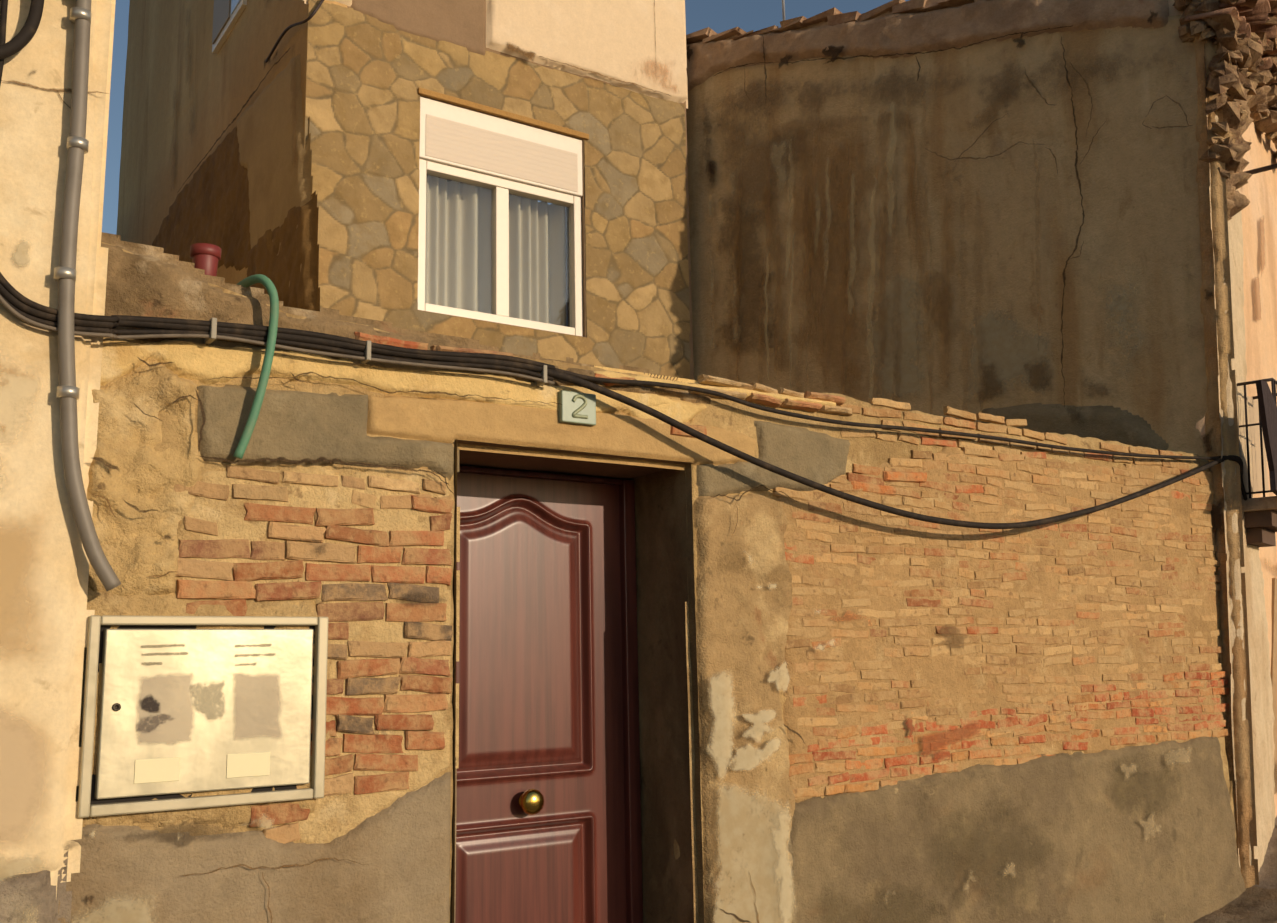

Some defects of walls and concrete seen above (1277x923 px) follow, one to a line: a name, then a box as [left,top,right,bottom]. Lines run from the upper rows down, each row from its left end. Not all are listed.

water stain [708,125,801,348]
crack [714,25,1106,406]
spalling [92,457,119,470]
spalling [173,390,206,452]
flaking render [147,466,454,797]
flaking render [710,398,1235,923]
flaking render [249,803,310,844]